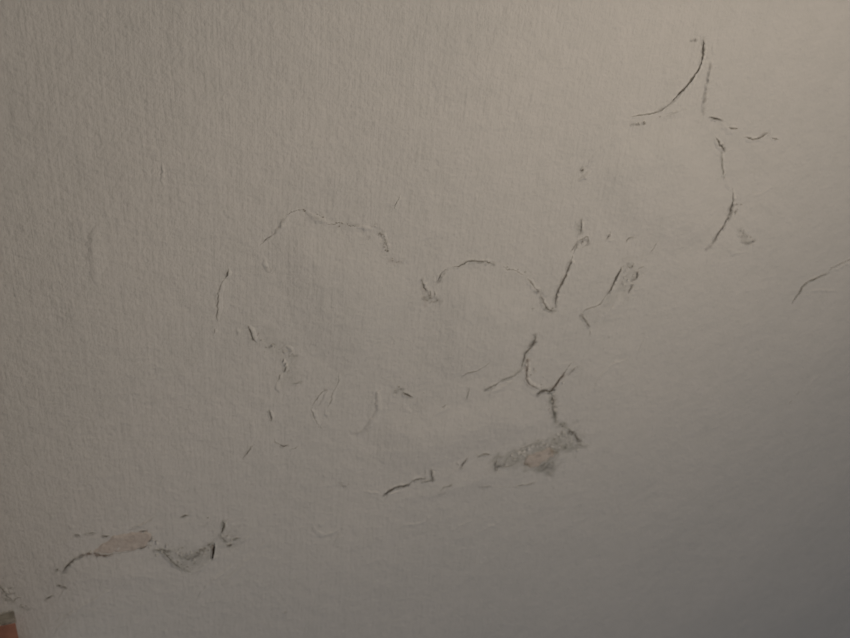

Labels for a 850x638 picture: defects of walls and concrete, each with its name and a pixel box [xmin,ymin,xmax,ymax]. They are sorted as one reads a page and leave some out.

crack [629,38,712,119]
crack [708,115,779,244]
crack [259,208,399,263]
crack [212,268,241,336]
crack [437,244,579,313]
crack [791,258,850,304]
crack [461,335,578,421]
crack [383,476,425,500]
flaking render [63,516,256,575]